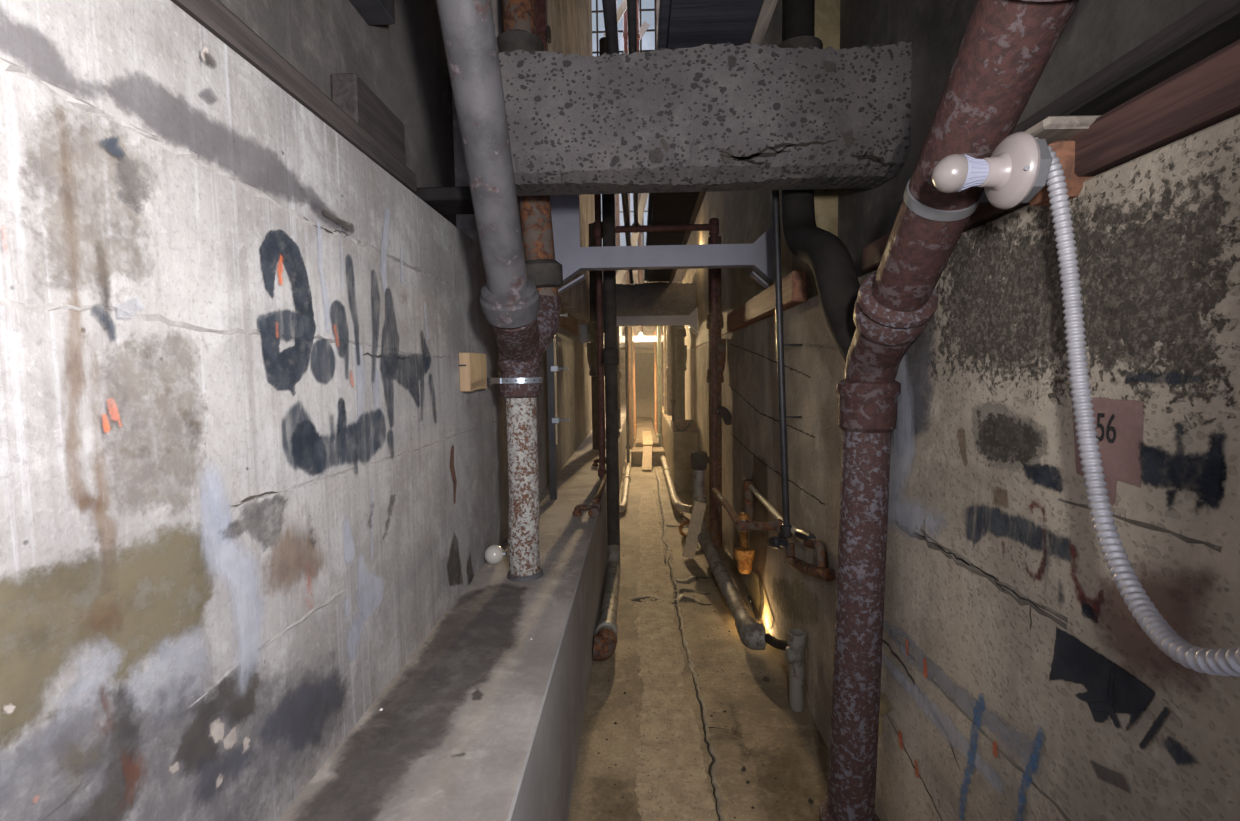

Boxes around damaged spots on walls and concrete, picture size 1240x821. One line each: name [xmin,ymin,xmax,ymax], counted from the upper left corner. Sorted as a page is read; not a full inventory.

leakage [0,22,91,94]
leakage [110,78,402,473]
crack [721,140,896,165]
leakage [0,475,344,821]
leakage [298,520,526,821]
crack [631,468,752,821]